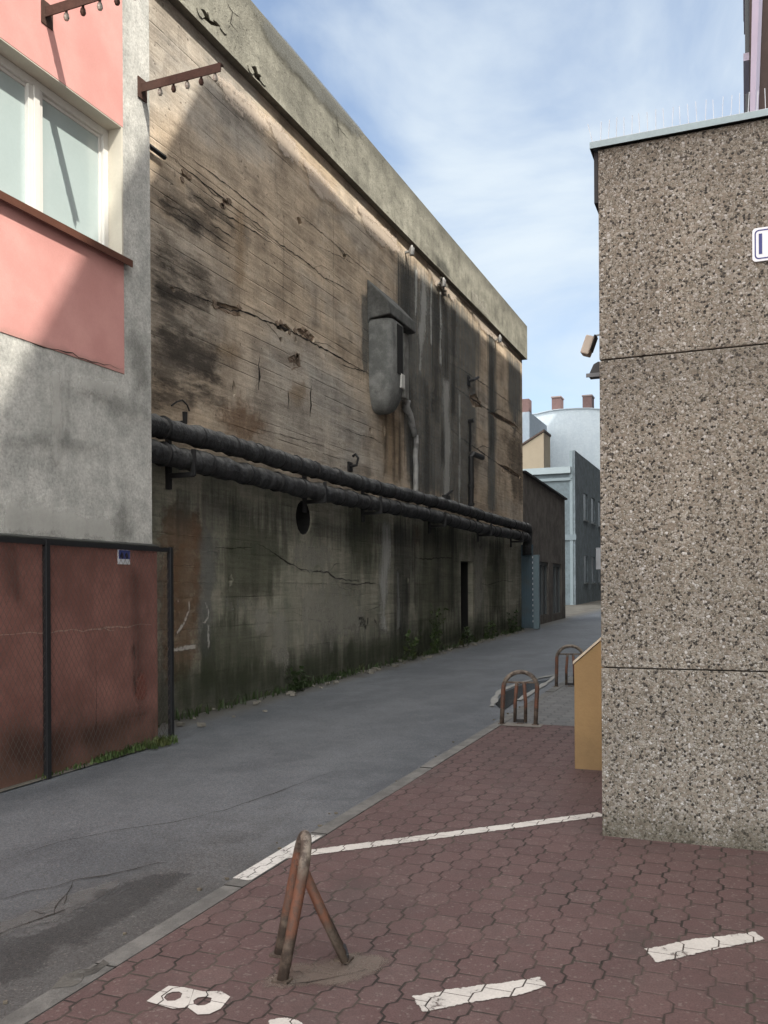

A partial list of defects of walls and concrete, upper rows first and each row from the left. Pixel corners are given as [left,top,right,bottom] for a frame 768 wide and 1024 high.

spalling [196,7,227,34]
crack [165,155,397,374]
leakage [398,255,496,513]
leakage [509,354,520,423]
crack [215,544,379,590]
leakage [379,521,400,630]